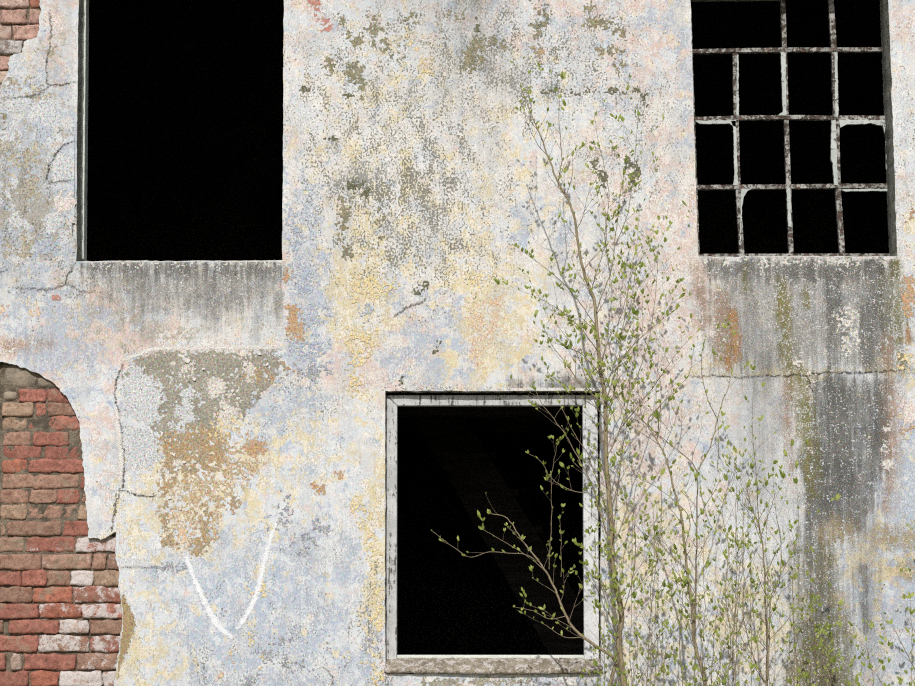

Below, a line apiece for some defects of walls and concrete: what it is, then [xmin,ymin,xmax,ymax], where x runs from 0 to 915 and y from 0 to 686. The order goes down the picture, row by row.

crack [1,13,70,100]
flaking render [0,0,76,262]
crack [45,141,72,183]
peeling [333,178,371,261]
crack [21,262,95,293]
damp [92,261,282,306]
peeling [450,262,507,371]
peeling [113,208,429,559]
flaking render [382,376,534,390]
crack [695,357,905,392]
flaking render [0,344,137,686]
damp [681,257,915,686]